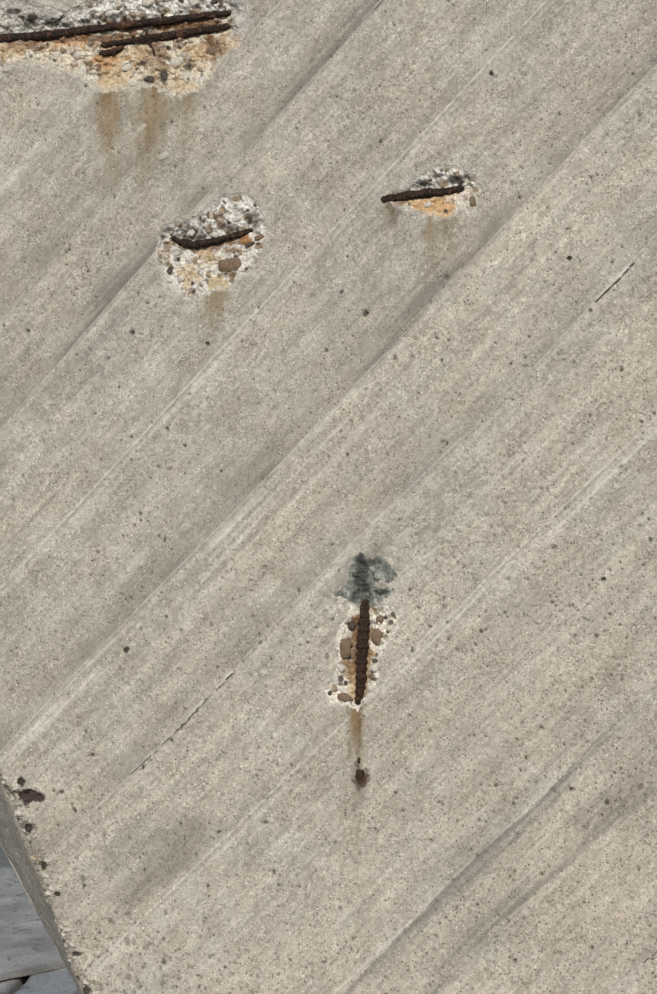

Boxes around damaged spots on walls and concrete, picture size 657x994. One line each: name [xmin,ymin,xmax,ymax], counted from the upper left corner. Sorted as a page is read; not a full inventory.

spalling [0,0,252,98]
spalling [381,166,482,221]
spalling [155,193,268,301]
spalling [325,552,399,711]
crack [131,673,233,774]
rust [353,756,369,785]
spalling [0,770,104,994]